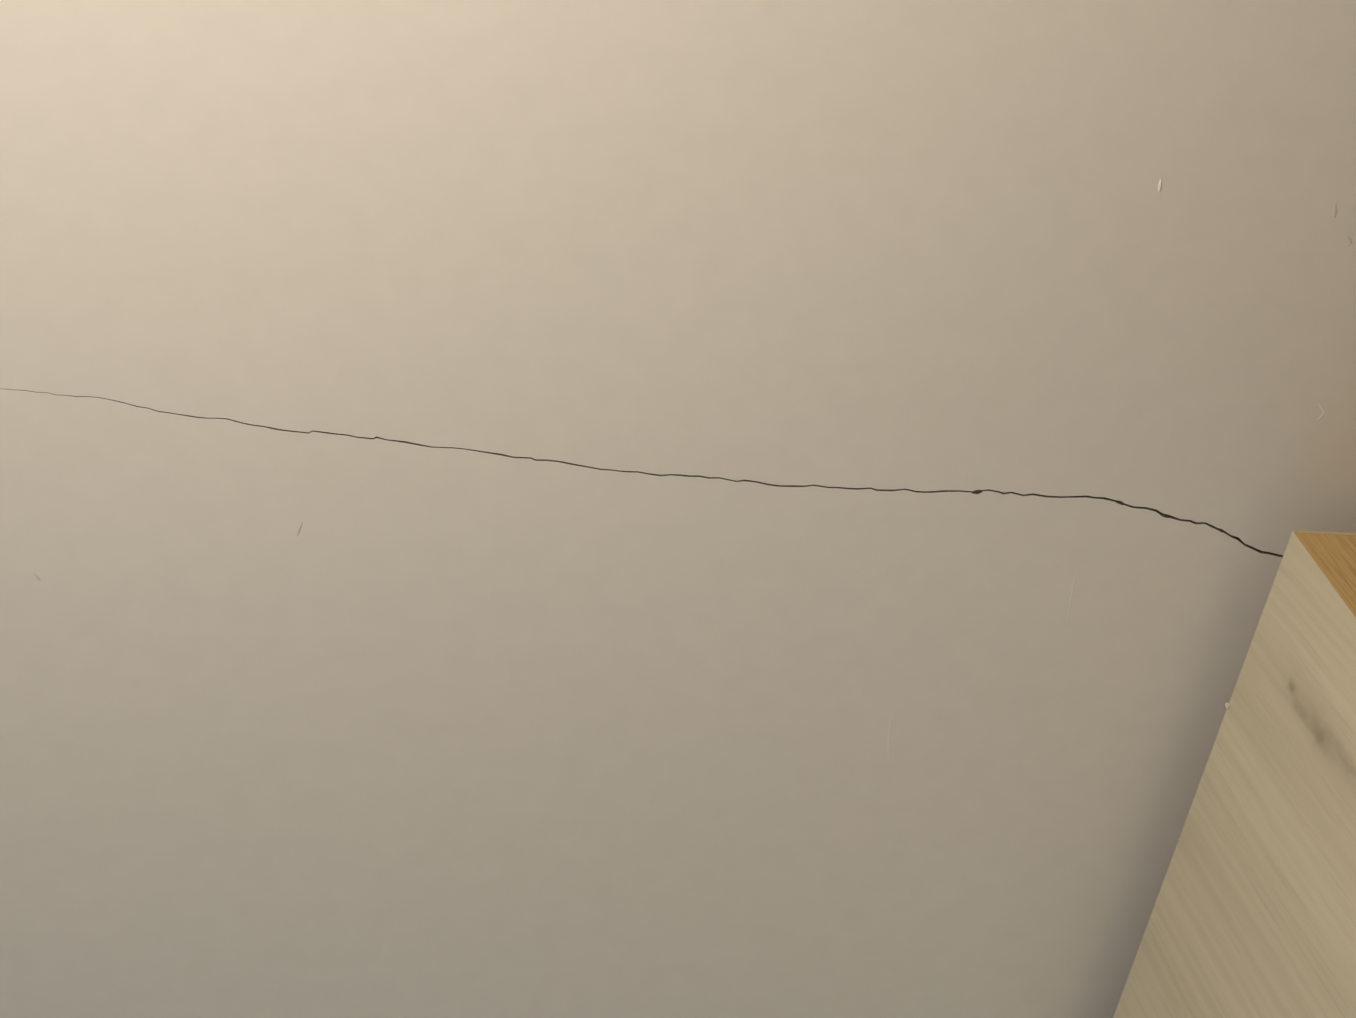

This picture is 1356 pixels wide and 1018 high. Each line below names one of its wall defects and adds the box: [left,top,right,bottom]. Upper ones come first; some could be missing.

crack [7,389,1283,557]